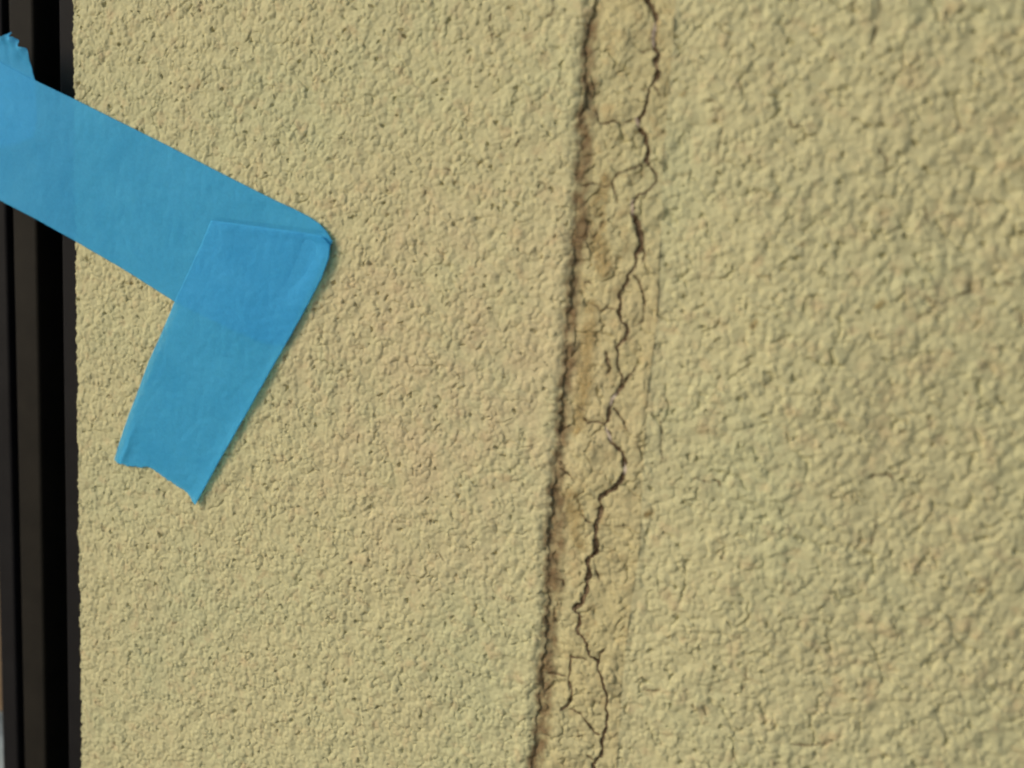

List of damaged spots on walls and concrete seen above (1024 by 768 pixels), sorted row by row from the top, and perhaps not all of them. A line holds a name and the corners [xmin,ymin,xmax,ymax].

crack [547,0,661,768]